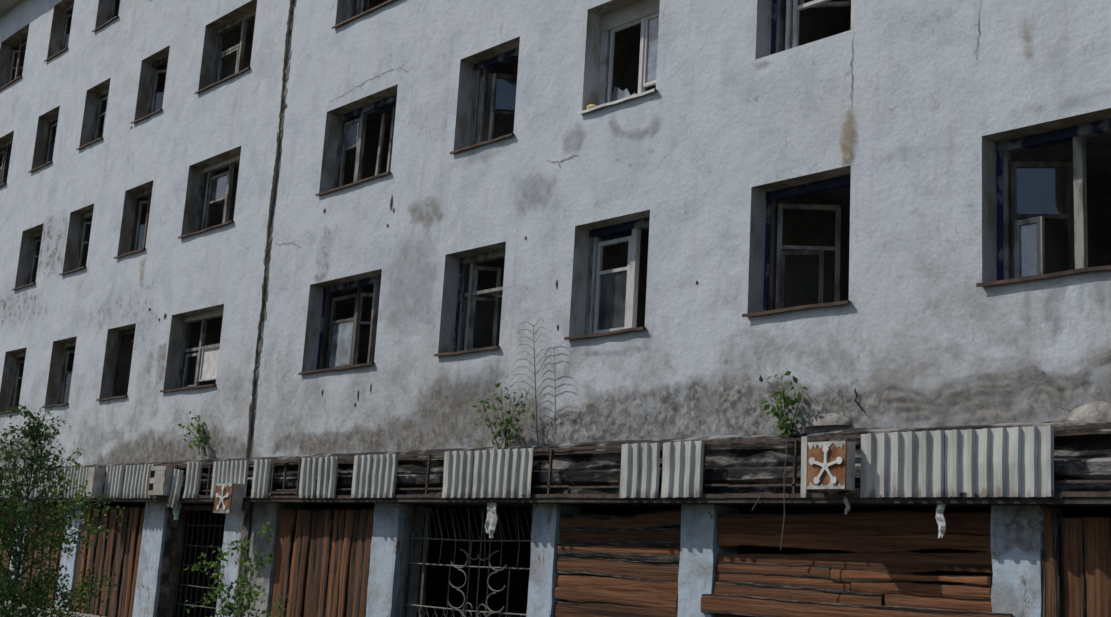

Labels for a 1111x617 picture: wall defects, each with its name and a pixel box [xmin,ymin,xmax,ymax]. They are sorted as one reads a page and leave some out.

crack [329,61,415,102]
leakage [851,355,1111,428]
leakage [0,440,40,468]
leakage [97,429,247,465]